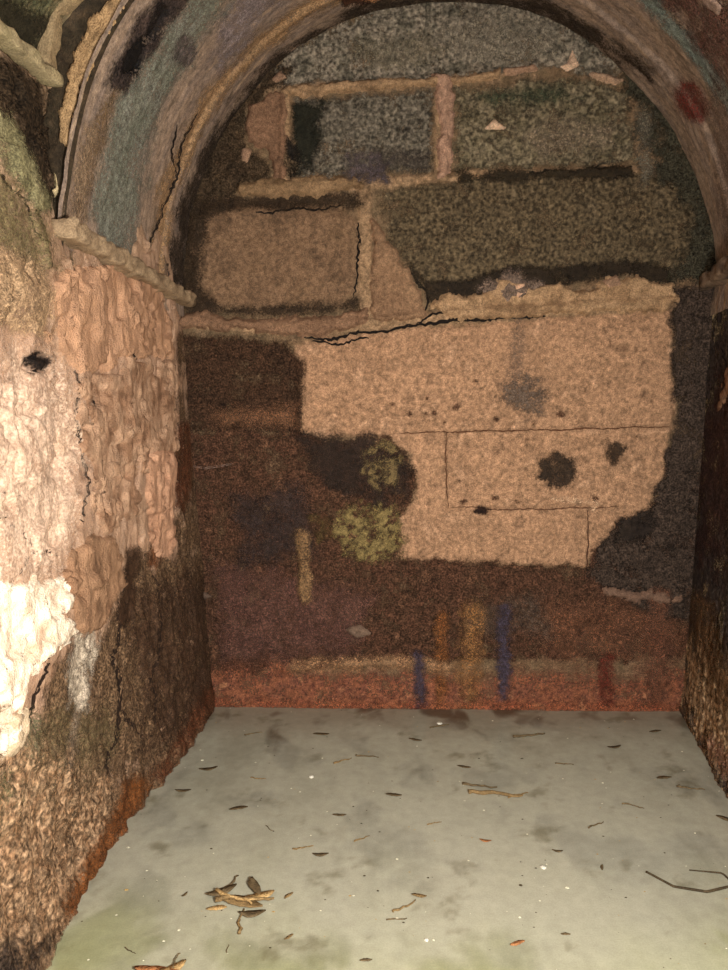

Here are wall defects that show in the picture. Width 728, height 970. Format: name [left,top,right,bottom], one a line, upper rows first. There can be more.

flaking render [0,217,683,761]
water stain [0,278,728,970]
crack [304,270,546,346]